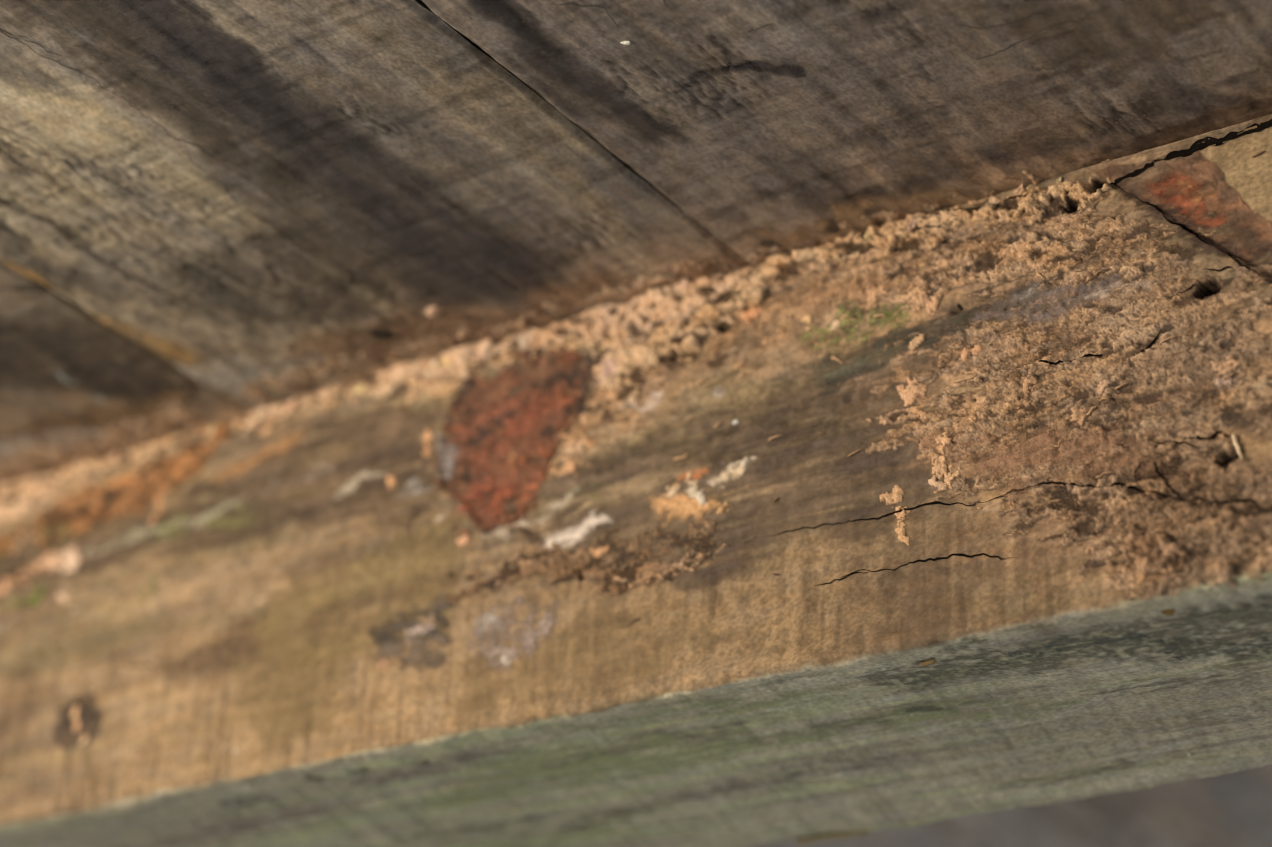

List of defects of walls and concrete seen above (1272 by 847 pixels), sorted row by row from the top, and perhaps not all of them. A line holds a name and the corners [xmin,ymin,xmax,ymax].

damp [0,0,686,474]
crack [749,431,1272,542]
crack [815,553,1016,586]